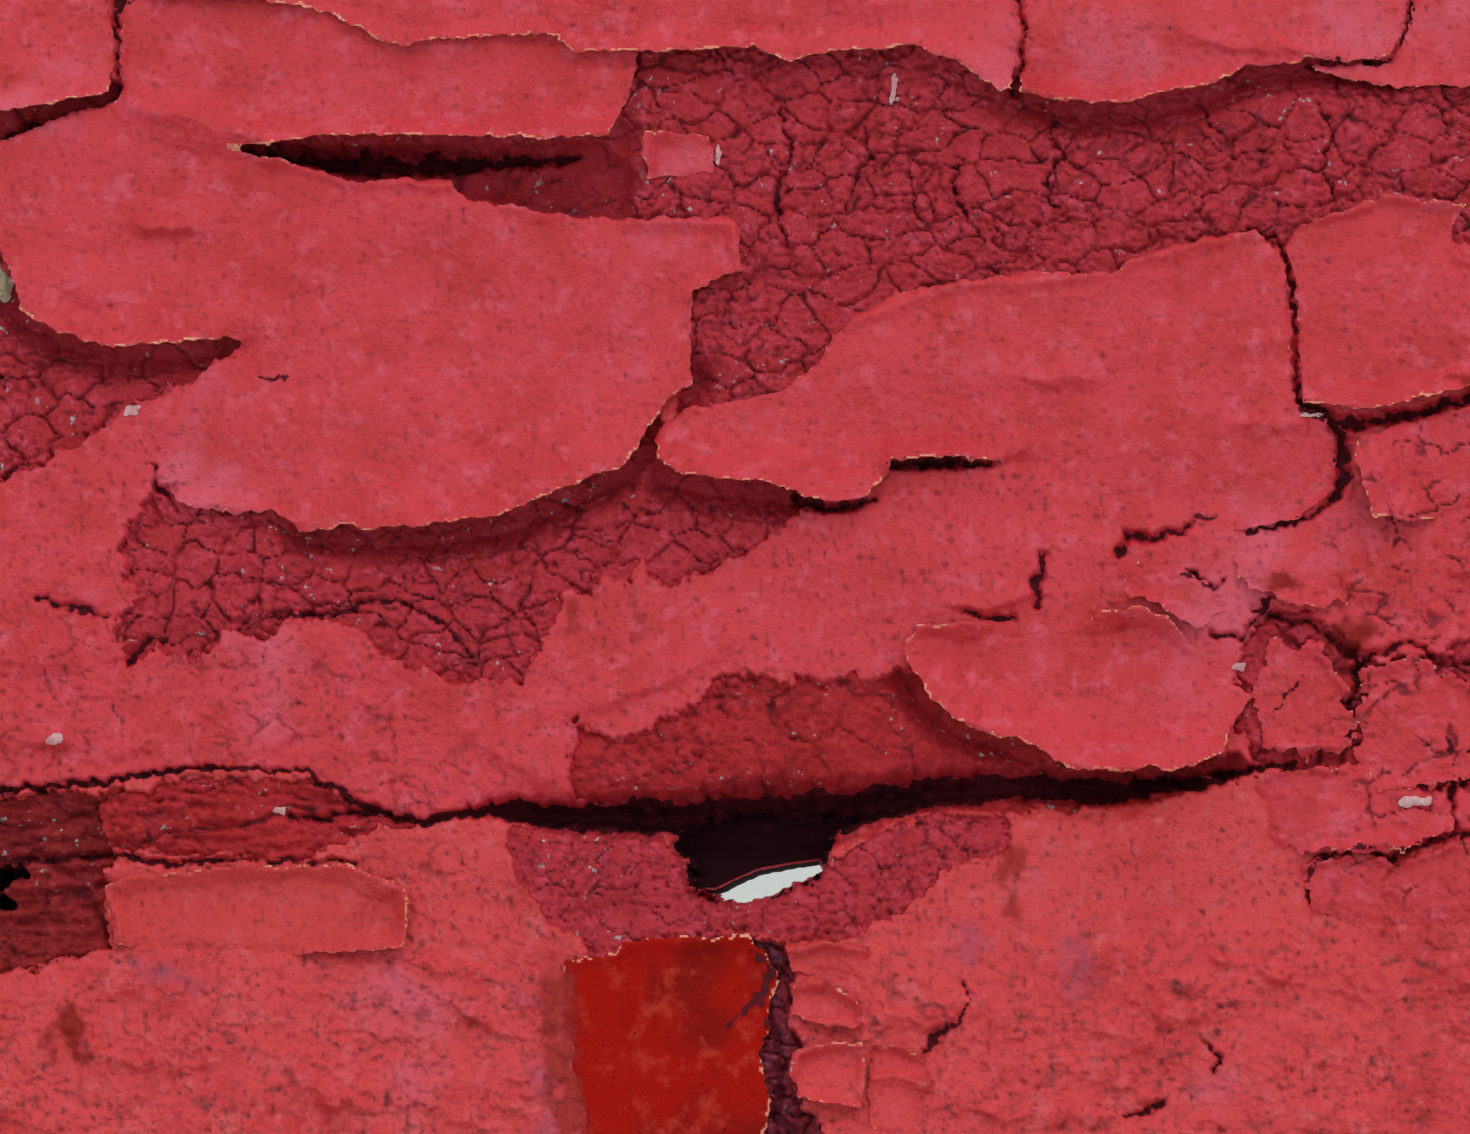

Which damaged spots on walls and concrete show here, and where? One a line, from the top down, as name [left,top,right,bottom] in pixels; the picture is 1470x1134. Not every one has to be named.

crack [1011,0,1028,97]
crack [773,190,788,242]
crack [777,111,794,157]
crack [844,130,875,212]
crack [950,159,981,237]
crack [1041,138,1068,208]
crack [1321,113,1335,199]
peeling [0,0,1470,686]
crack [0,760,1297,837]
crack [0,852,356,869]
peeling [0,776,416,974]
peeling [507,546,1470,1134]